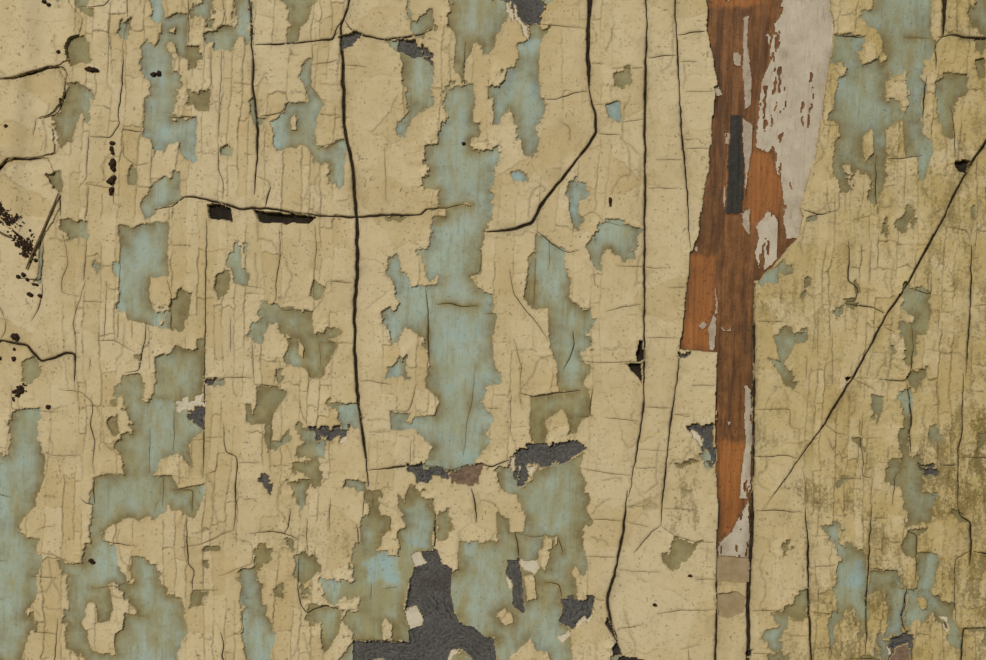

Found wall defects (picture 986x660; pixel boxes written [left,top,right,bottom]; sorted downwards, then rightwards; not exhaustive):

crack [0,0,152,505]
peeling [58,339,225,660]
peeling [140,0,255,163]
peeling [256,211,316,225]
peeling [246,301,360,510]
crack [155,0,462,613]
peeling [282,0,596,660]
crack [425,288,496,365]
crack [456,0,720,660]
peeling [676,0,986,660]
crack [746,107,986,660]
crack [909,0,986,113]